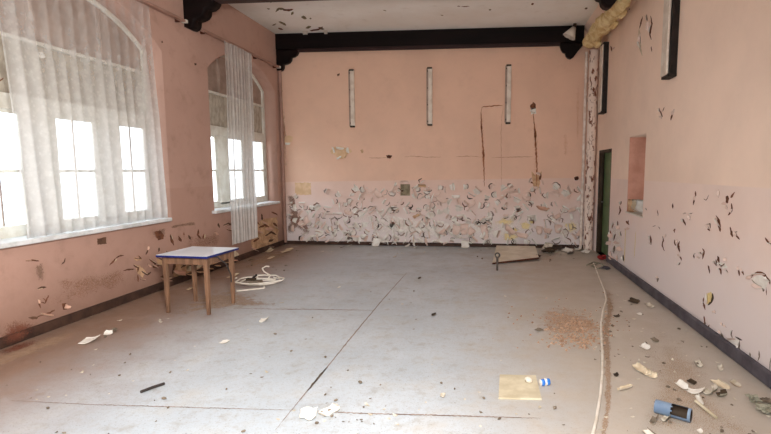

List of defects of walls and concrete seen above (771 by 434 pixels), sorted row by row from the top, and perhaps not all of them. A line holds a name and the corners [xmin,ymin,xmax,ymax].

peeling [267,2,328,35]
peeling [637,14,653,55]
spalling [123,228,239,282]
peeling [251,171,590,254]
peeling [606,199,647,262]
peeling [648,225,682,265]
peeling [705,192,740,240]
peeling [693,248,770,295]
peeling [28,286,71,319]
peeling [701,292,716,327]
peeling [718,322,741,349]